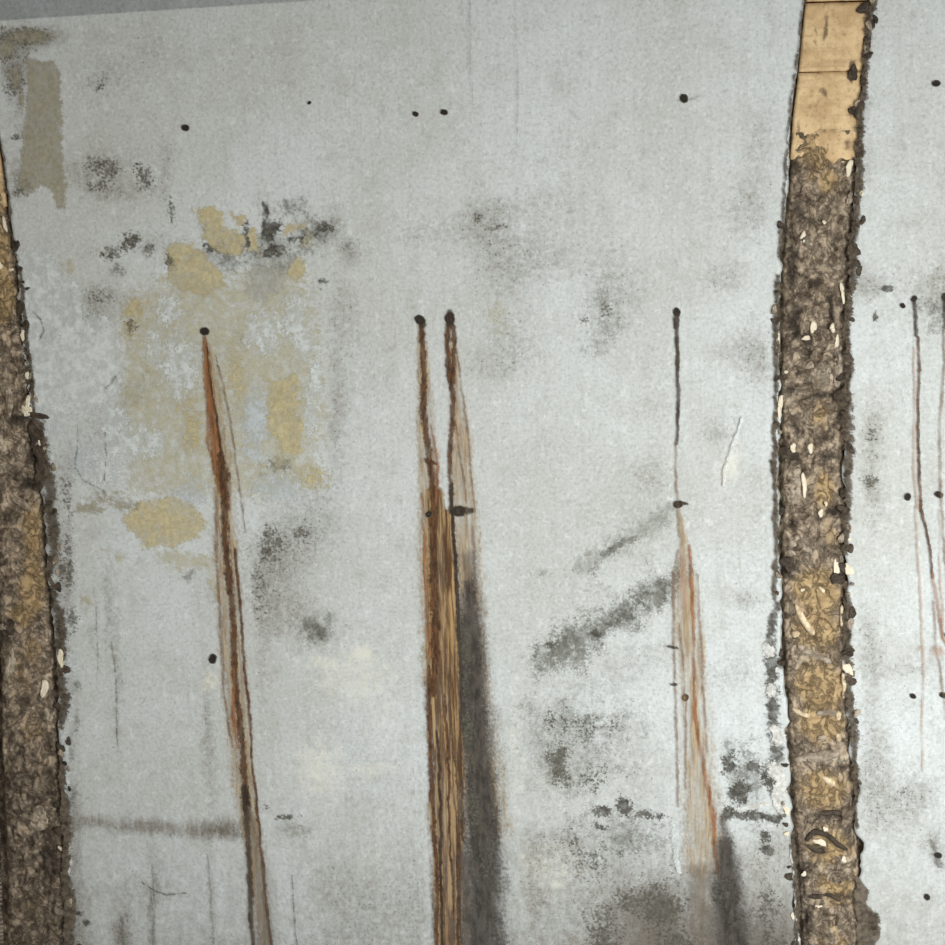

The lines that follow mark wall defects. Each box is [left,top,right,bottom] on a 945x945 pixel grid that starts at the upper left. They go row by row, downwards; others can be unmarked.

spalling [778,0,806,260]
peeling [0,139,334,945]
corrosion [203,336,273,945]
corrosion [417,310,509,945]
damp [460,569,503,945]
damp [544,707,628,792]
damp [562,795,665,882]
corrosion [673,312,681,449]
damp [582,749,788,945]
peeling [762,275,813,818]
spalling [854,875,881,945]
corrosion [912,299,945,694]